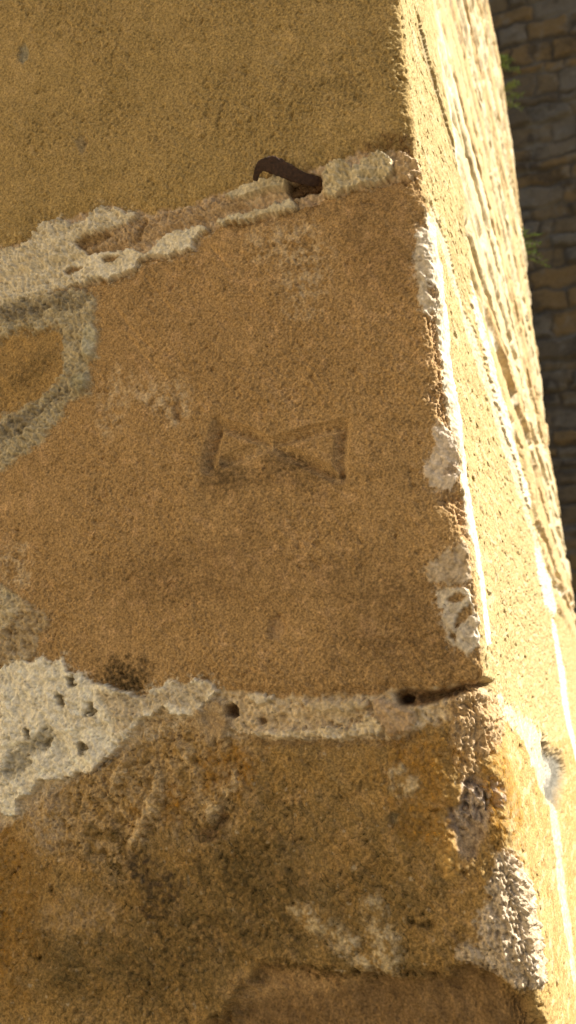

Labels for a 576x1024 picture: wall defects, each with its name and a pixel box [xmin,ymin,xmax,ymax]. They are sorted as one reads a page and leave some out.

flaking render [413,226,481,655]
crack [231,678,493,748]
spalling [209,846,549,1024]